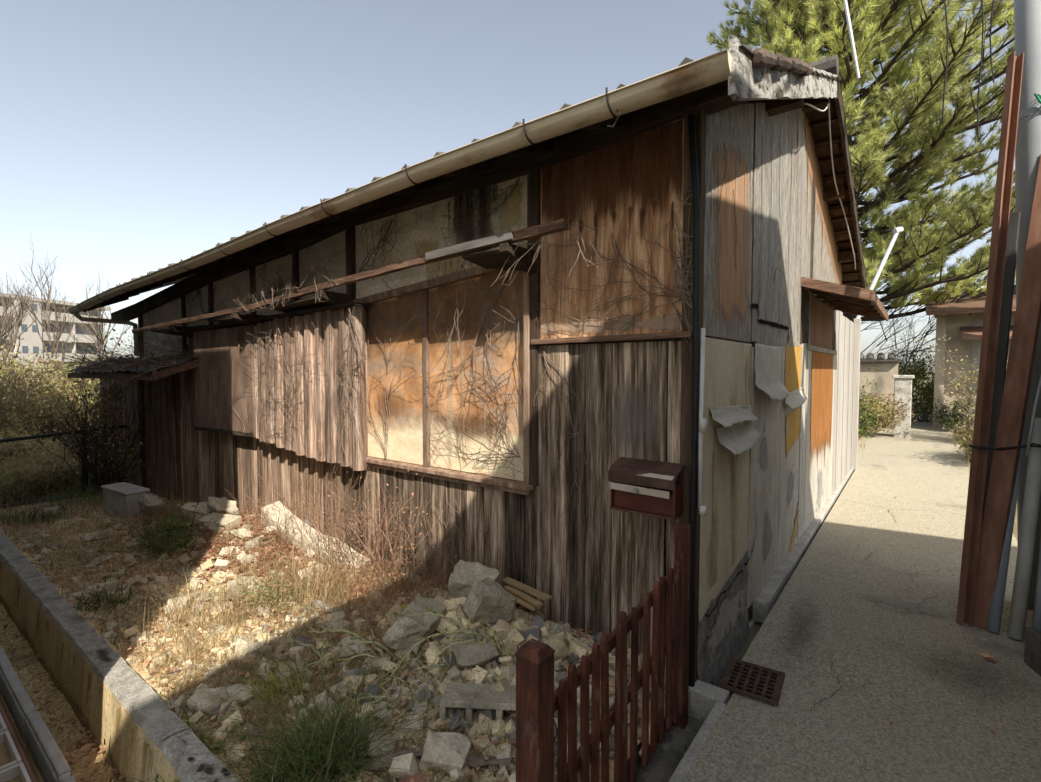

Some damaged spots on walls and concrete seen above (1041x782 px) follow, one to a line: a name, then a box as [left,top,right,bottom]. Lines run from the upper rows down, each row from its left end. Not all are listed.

water stain [448,184,498,255]
spalling [703,515,773,673]